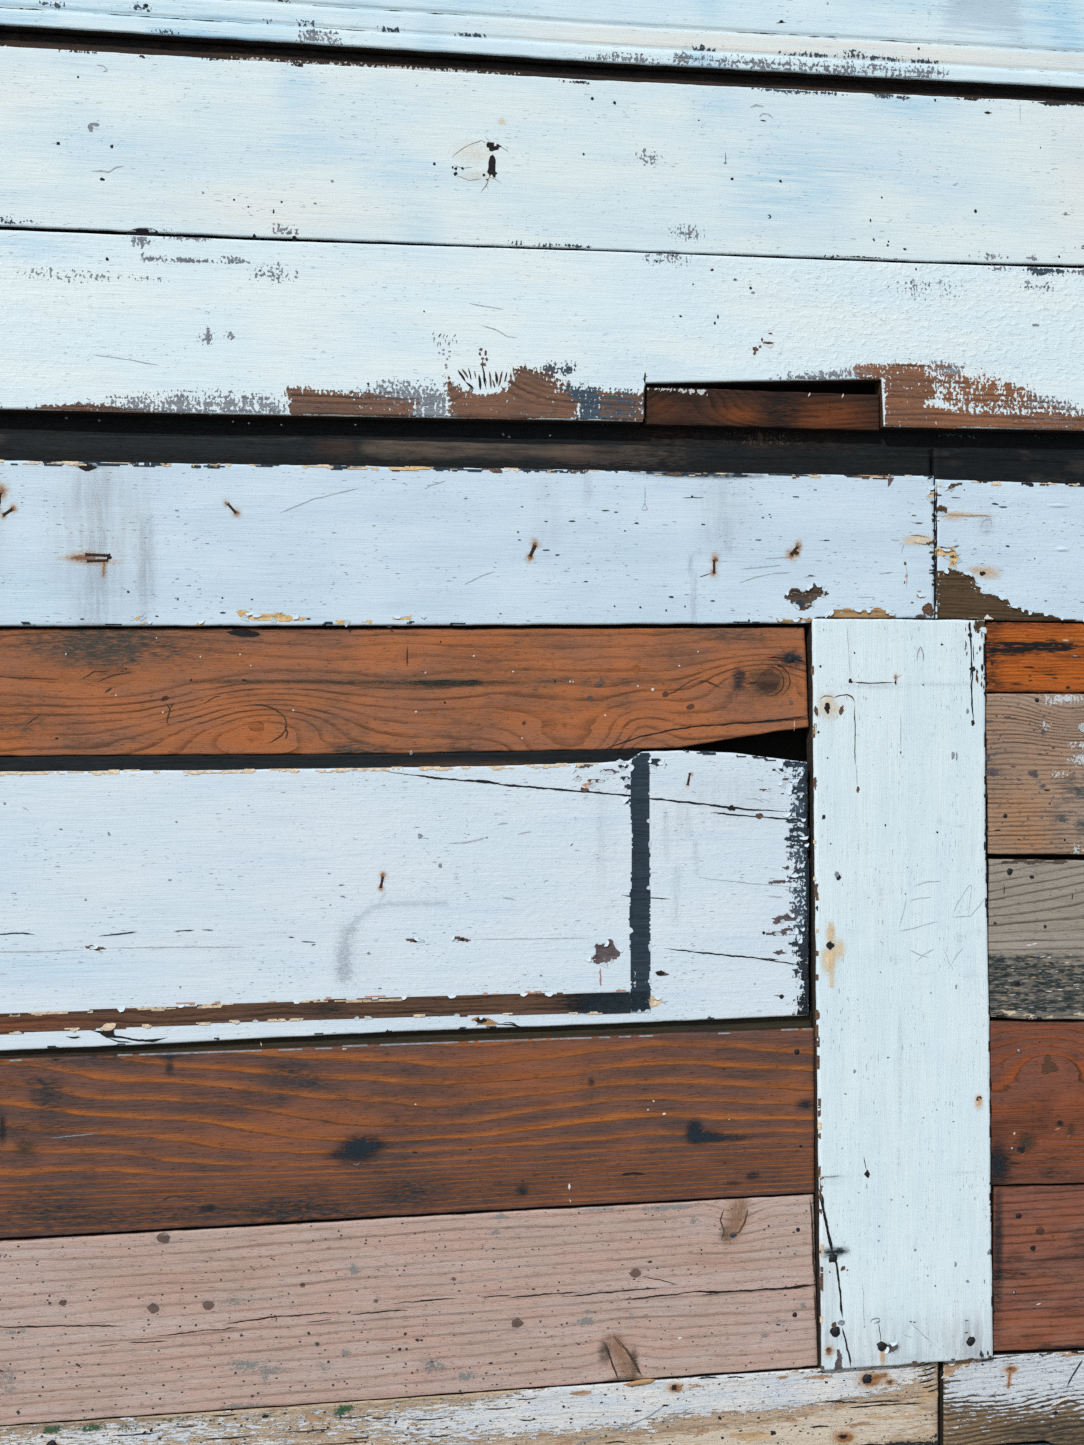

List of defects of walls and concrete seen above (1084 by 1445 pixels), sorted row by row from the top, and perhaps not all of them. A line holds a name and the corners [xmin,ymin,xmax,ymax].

peeling [199,326,235,345]
peeling [26,332,644,421]
peeling [768,358,1084,431]
corrosion [66,552,106,576]
peeling [776,575,896,623]
peeling [844,474,1084,698]
crack [388,771,801,822]
peeling [736,755,820,1069]
peeling [586,927,633,968]
spalling [819,1243,848,1291]